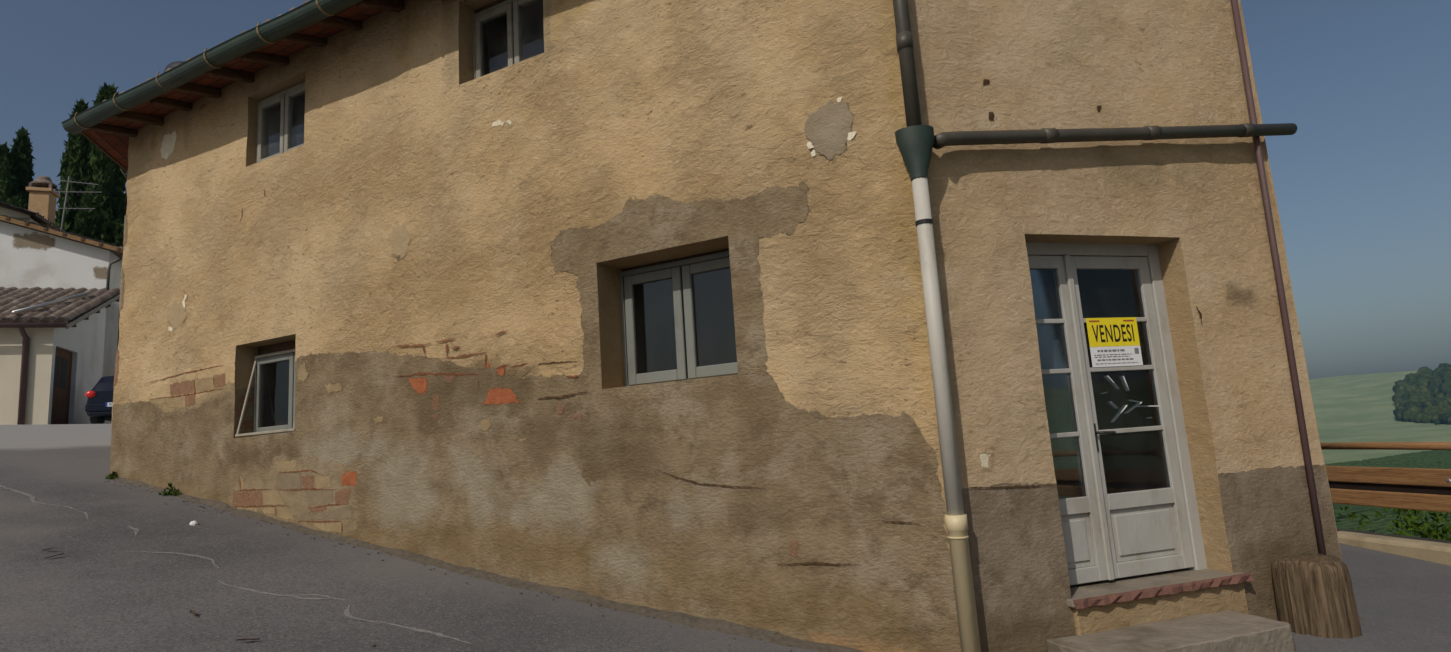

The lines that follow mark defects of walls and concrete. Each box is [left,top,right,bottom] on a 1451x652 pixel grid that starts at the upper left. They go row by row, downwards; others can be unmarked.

spalling [159,129,179,164]
peeling [109,141,1071,652]
crack [656,469,763,489]